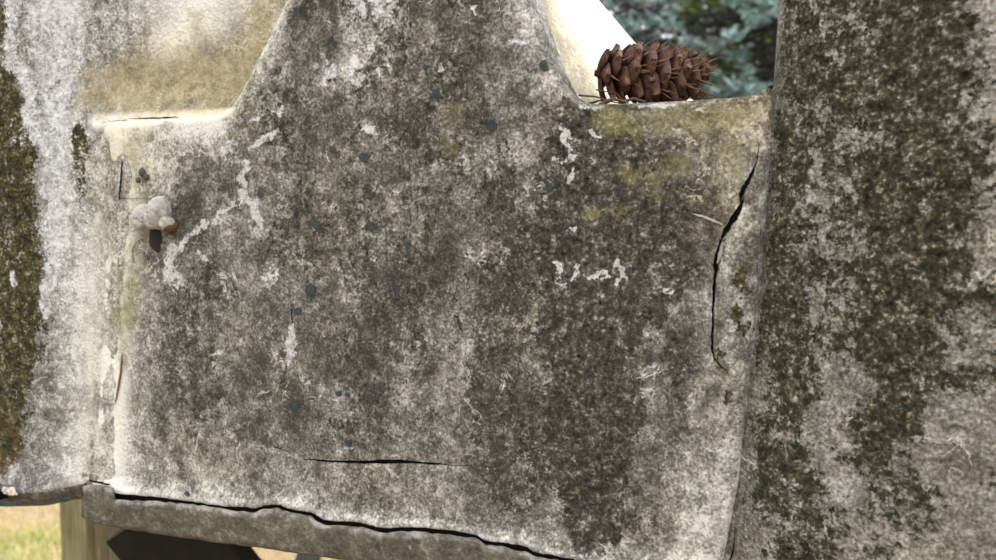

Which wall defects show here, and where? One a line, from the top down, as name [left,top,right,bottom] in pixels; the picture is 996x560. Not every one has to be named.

leakage [961,14,996,95]
leakage [945,102,996,221]
leakage [3,151,53,336]
crack [694,144,759,379]
leakage [741,0,947,560]
leakage [942,259,996,406]
spalling [0,478,87,507]
crack [83,479,574,560]
crack [273,446,483,467]